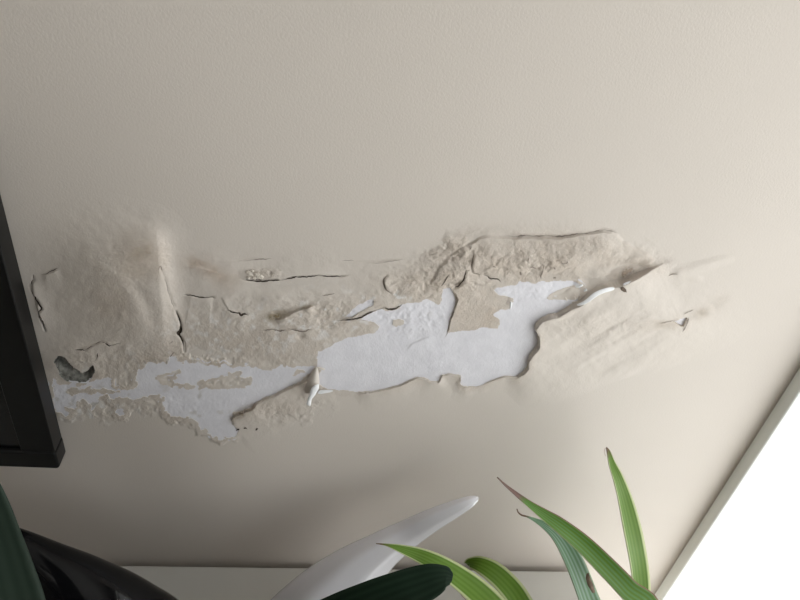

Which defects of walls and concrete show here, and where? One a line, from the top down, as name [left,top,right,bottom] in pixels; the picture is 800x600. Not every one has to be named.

crack [31,268,57,329]
crack [158,266,214,357]
crack [247,258,354,296]
peeling [48,254,752,455]